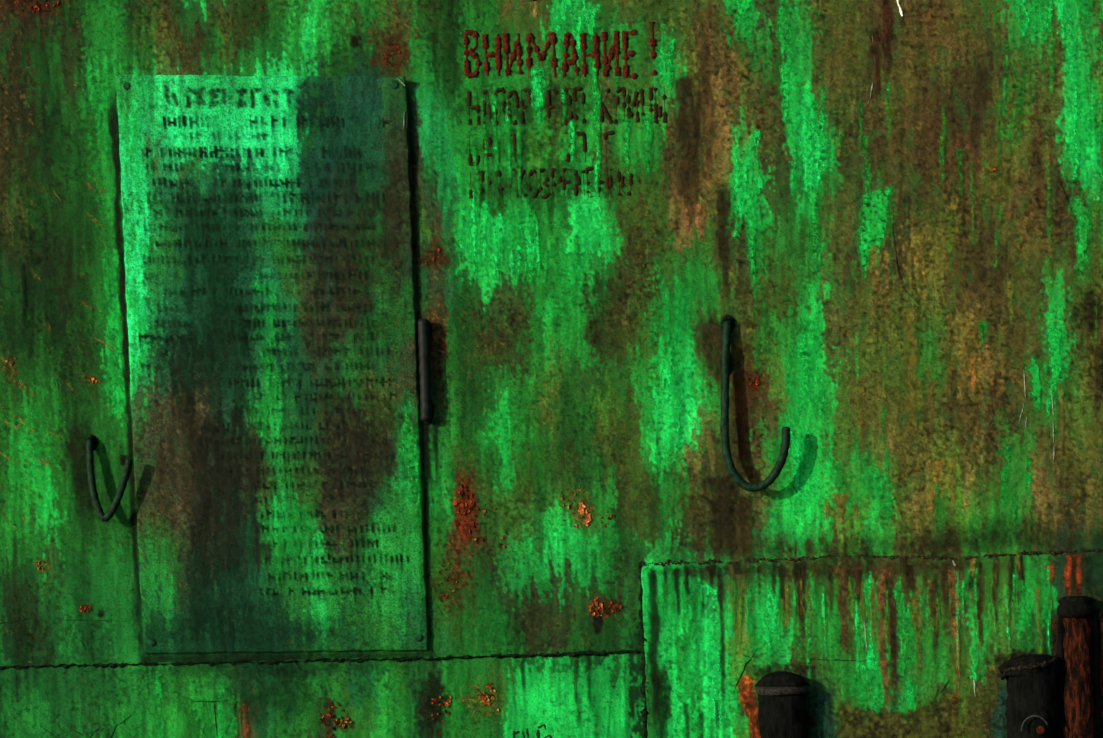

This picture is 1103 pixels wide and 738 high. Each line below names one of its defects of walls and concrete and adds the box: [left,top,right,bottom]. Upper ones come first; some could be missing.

rust [453,483,505,547]
rust [560,486,614,527]
rust [588,597,622,619]
rust [320,698,353,738]
rust [416,694,451,727]
rust [466,683,499,713]